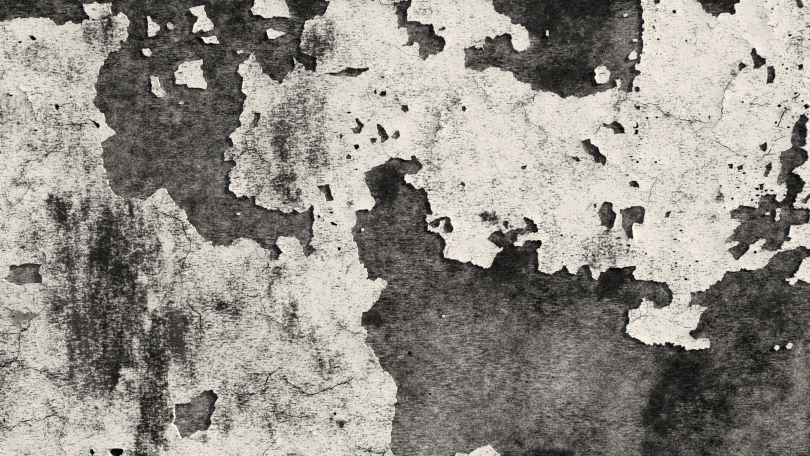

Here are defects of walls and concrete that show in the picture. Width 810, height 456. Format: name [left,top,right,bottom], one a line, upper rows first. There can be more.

peeling [463,0,660,99]
peeling [0,0,369,261]
crack [0,310,43,367]
flaking render [4,263,42,286]
damp [41,188,95,398]
damp [126,200,187,283]
crack [155,210,191,277]
damp [169,294,214,388]
crack [187,293,282,342]
peeling [351,48,810,456]
flaking render [173,389,219,438]
crack [235,368,353,405]